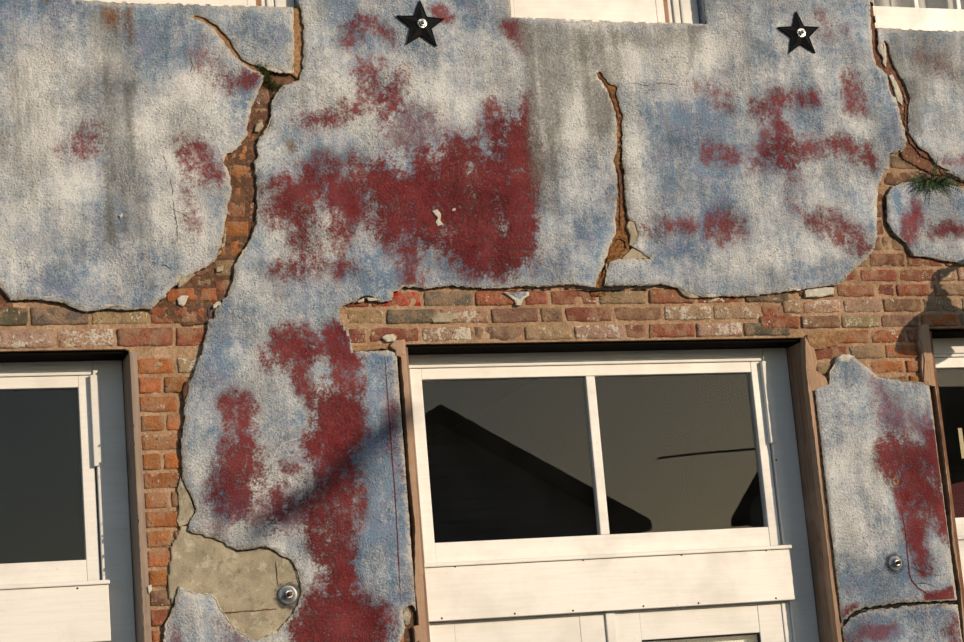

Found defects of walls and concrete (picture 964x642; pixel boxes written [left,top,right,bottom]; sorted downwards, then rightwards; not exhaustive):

peeling [173,132,226,231]
peeling [190,43,260,95]
peeling [260,55,544,287]
crack [590,72,675,297]
flaking render [0,150,964,642]
crack [843,507,955,625]